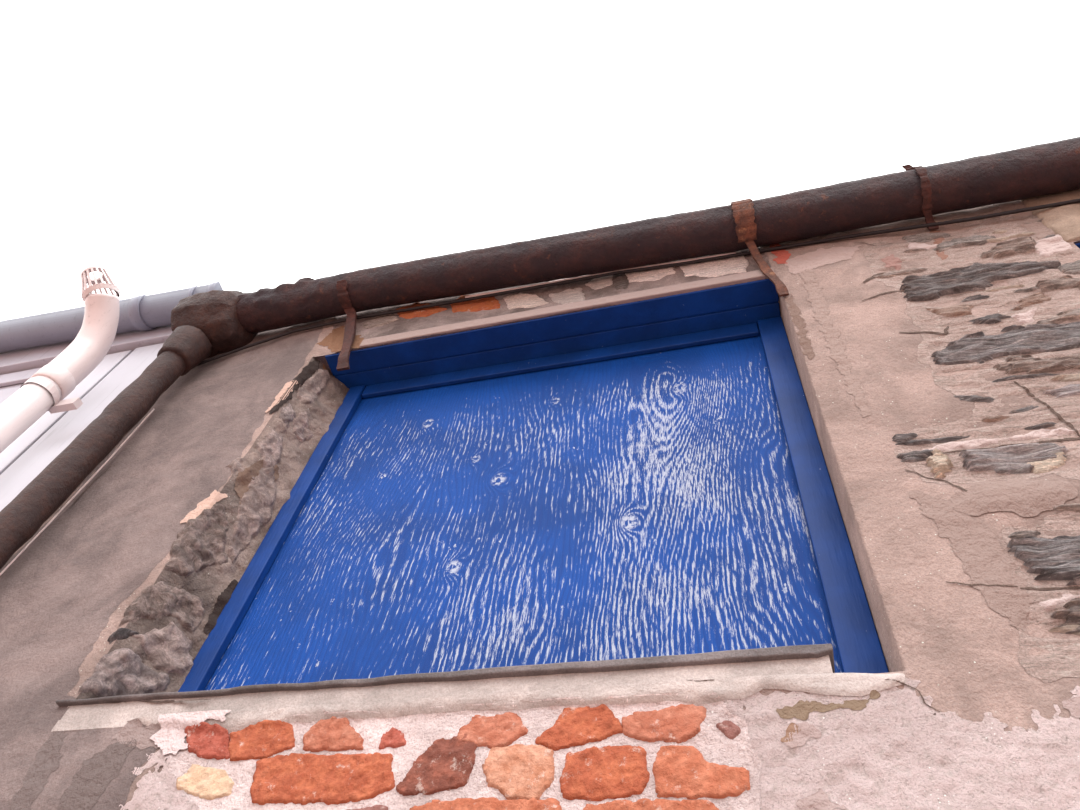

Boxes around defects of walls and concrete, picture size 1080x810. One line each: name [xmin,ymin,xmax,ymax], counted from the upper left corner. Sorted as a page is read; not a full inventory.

rust [769,243,791,264]
rust [317,326,364,352]
spalling [863,208,1080,485]
crack [942,381,1080,453]
spalling [1002,503,1080,683]